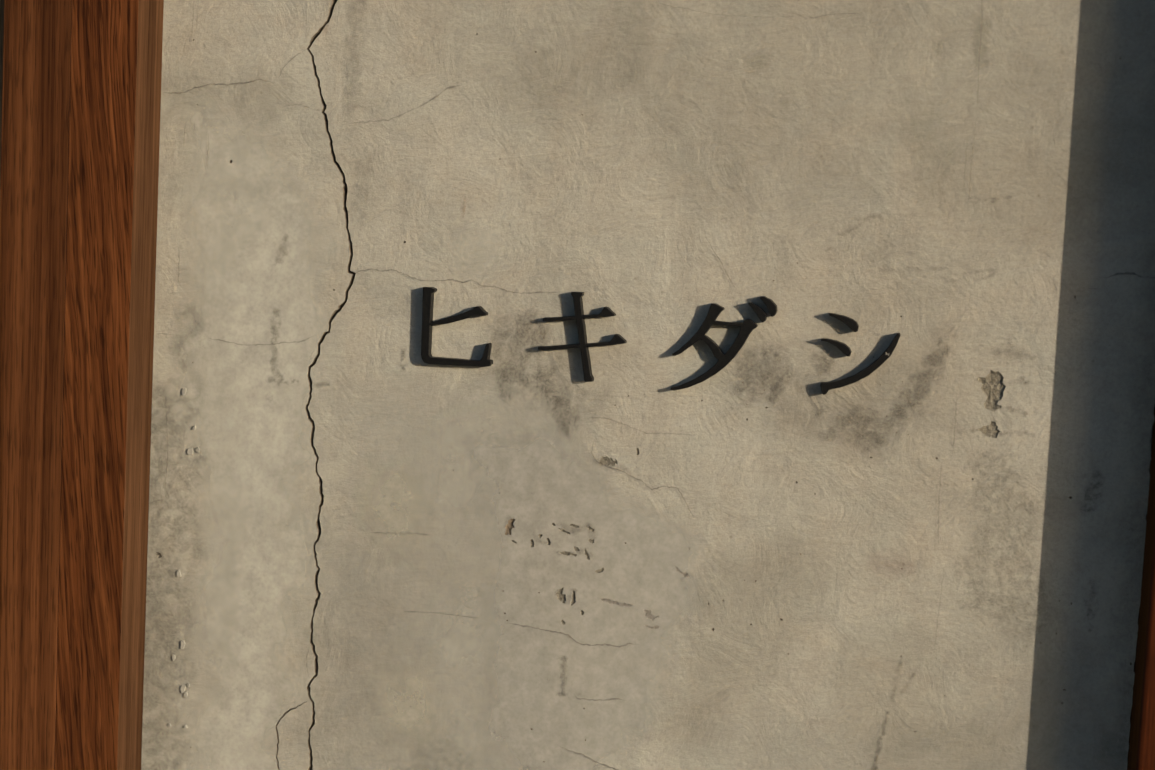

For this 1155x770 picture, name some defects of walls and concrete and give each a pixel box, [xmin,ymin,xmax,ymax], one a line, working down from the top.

crack [275,0,364,770]
spalling [977,370,1006,438]
spalling [504,519,604,573]
spalling [556,588,584,615]
spalling [601,598,660,629]